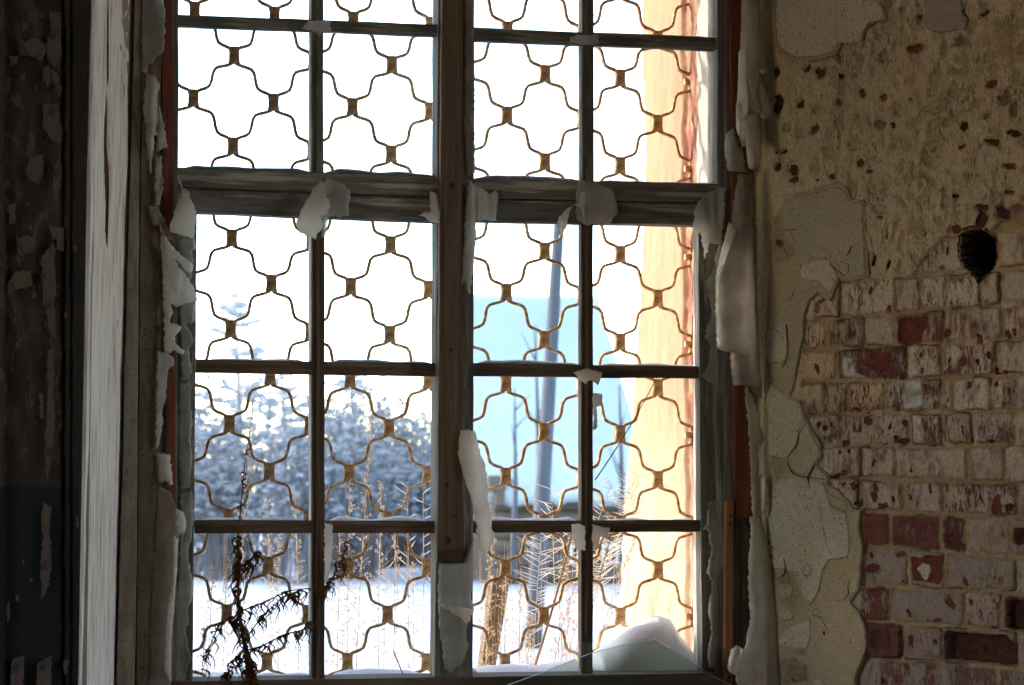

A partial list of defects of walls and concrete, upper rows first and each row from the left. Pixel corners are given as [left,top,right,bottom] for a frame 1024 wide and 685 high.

flaking render [772,0,888,79]
peeling [9,11,63,204]
peeling [736,50,783,169]
spalling [939,190,1023,284]
peeling [7,226,77,484]
crack [787,424,825,489]
flaking render [763,149,895,685]
peeling [30,503,52,599]
crack [768,540,812,580]
spalling [895,519,943,584]
peeling [10,655,69,685]
spalling [952,600,1024,664]